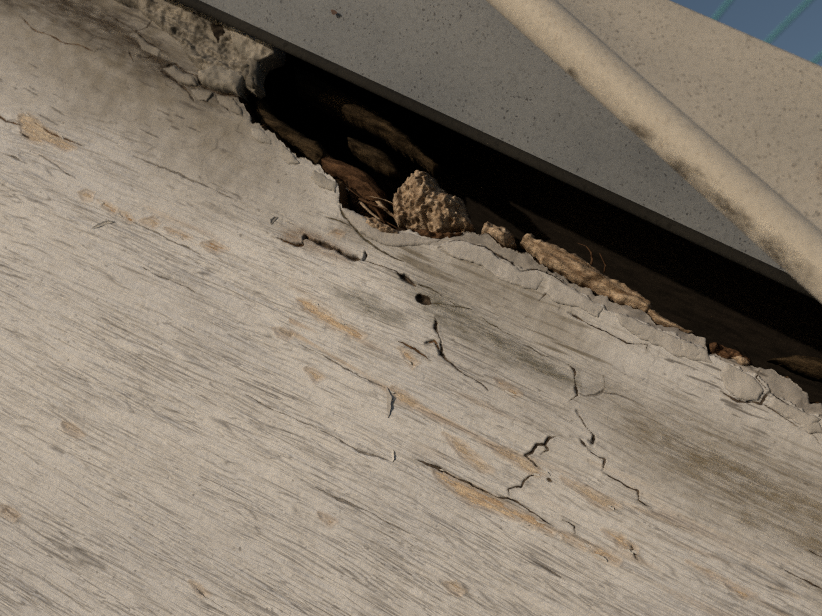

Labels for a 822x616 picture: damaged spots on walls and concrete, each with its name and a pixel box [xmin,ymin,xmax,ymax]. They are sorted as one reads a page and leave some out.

peeling [136,34,161,56]
peeling [163,66,243,116]
peeling [280,145,300,165]
crack [276,208,510,390]
hole [416,294,432,305]
peeling [441,241,605,317]
crack [572,314,648,349]
peeling [614,312,713,363]
peeling [720,364,763,402]
crack [570,366,647,506]
crack [415,436,575,529]